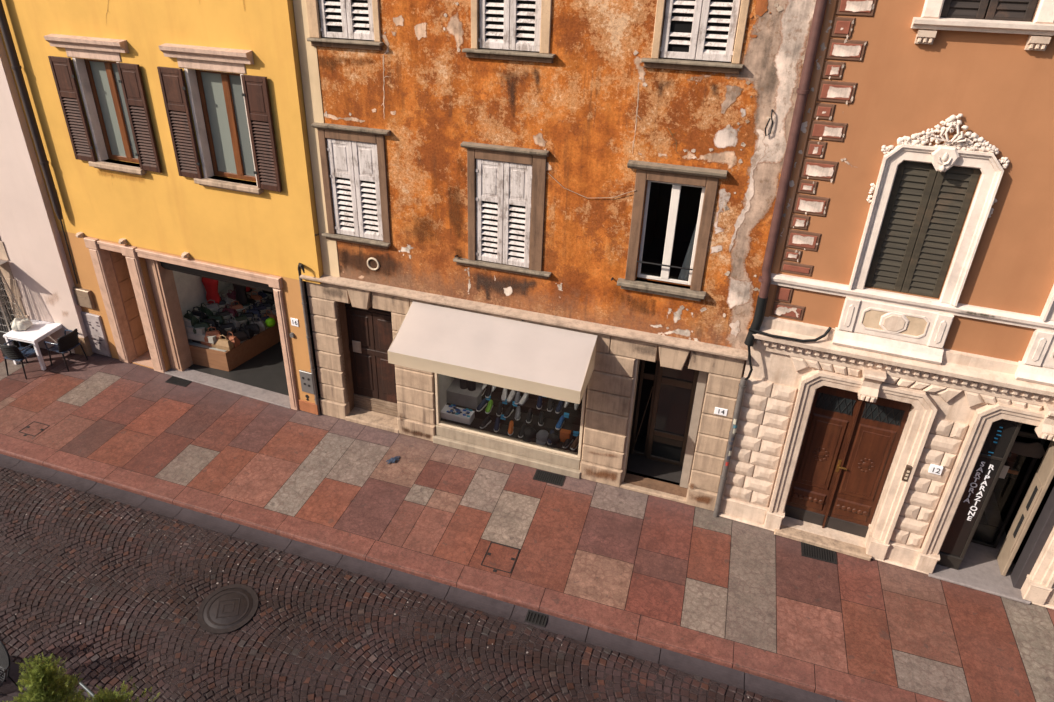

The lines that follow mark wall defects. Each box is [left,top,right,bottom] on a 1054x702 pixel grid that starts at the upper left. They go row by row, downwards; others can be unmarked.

peeling [381,15,427,54]
peeling [443,2,464,52]
peeling [633,50,647,87]
peeling [682,0,874,350]
peeling [650,305,707,342]